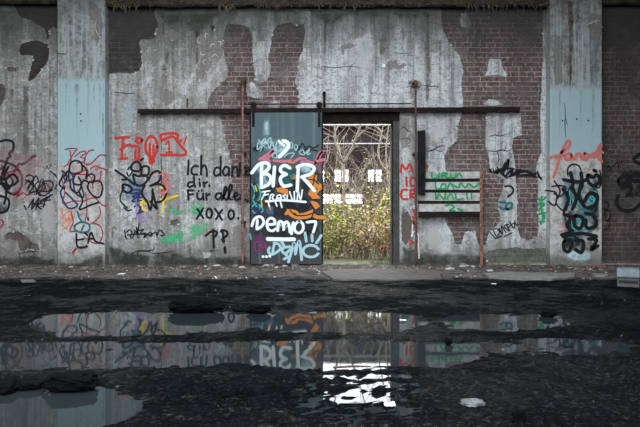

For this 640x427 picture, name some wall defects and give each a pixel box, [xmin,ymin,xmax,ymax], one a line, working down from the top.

flaking render [15,5,57,81]
flaking render [89,8,158,74]
flaking render [196,23,306,207]
flaking render [441,8,546,265]
flaking render [4,230,40,252]